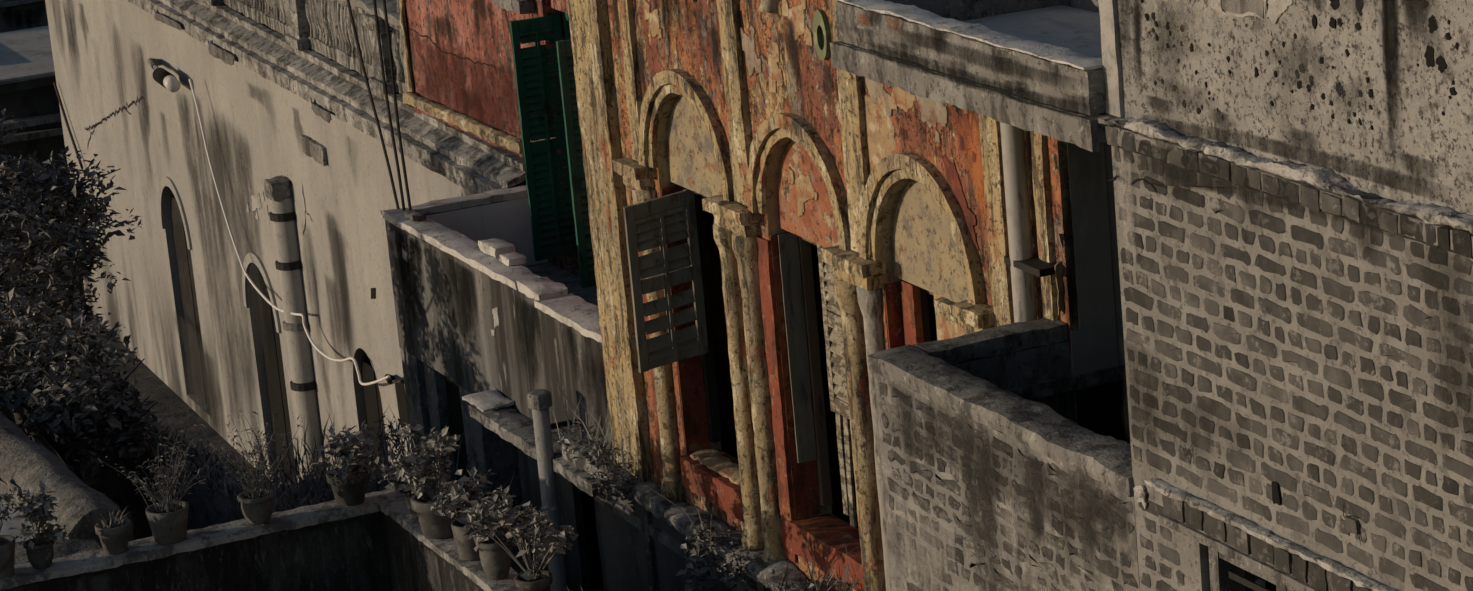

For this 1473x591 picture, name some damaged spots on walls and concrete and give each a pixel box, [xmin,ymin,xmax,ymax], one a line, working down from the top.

water stain [182,101,257,316]
water stain [426,19,517,131]
peeling [643,0,663,40]
peeling [739,0,814,93]
peeling [864,77,980,251]
peeling [1210,0,1294,24]
water stain [1119,0,1459,247]
water stain [310,217,351,342]
water stain [395,232,421,324]
water stain [449,260,476,343]
water stain [514,298,540,378]
water stain [567,329,608,427]